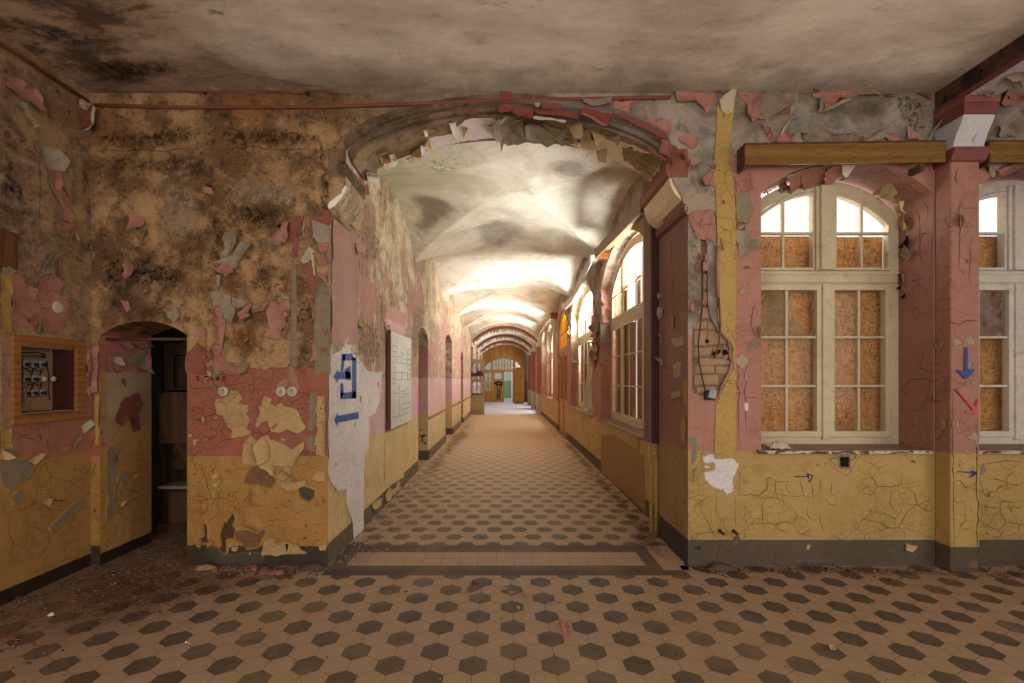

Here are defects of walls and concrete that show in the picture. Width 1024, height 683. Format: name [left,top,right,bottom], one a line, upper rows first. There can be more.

peeling [0,76,47,128]
peeling [75,99,98,131]
peeling [675,88,898,142]
peeling [823,119,943,142]
peeling [985,71,1024,107]
damp [223,130,329,205]
peeling [265,91,763,482]
peeling [0,140,155,521]
peeling [185,229,326,511]
peeling [194,511,306,566]
crack [693,478,837,566]